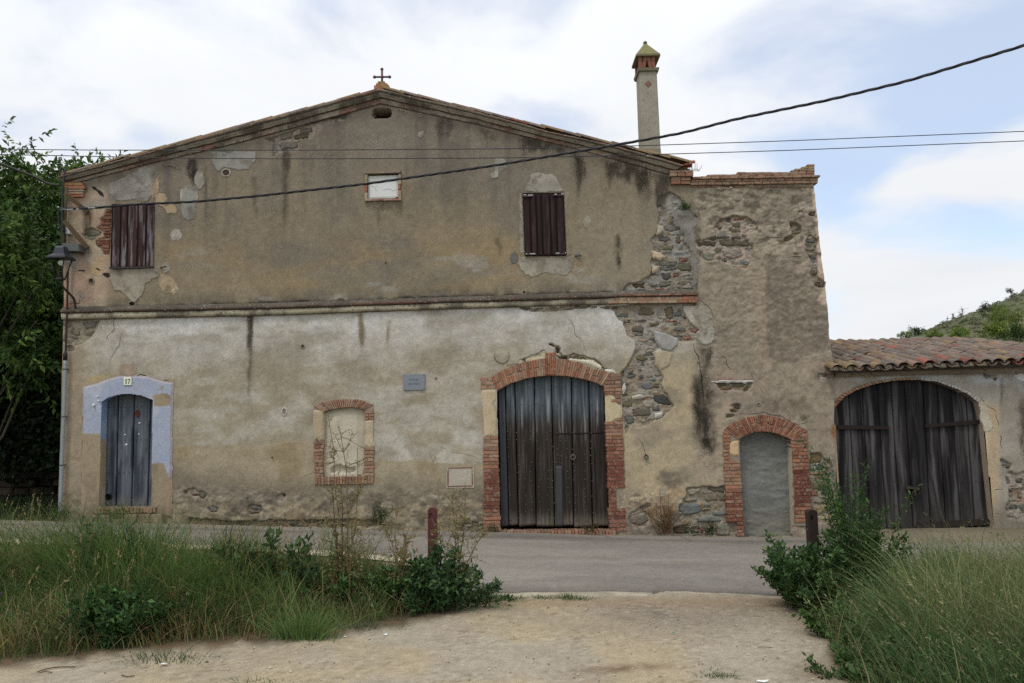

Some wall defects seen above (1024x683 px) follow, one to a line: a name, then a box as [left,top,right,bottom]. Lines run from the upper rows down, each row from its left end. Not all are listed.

peeling [150,151,256,240]
leakage [606,162,668,205]
spalling [84,210,112,255]
peeling [158,262,179,295]
spalling [623,193,757,291]
spalling [783,223,826,288]
spalling [508,303,715,433]
leakage [694,377,713,450]
spalling [673,485,735,537]
spalling [1000,460,1024,520]